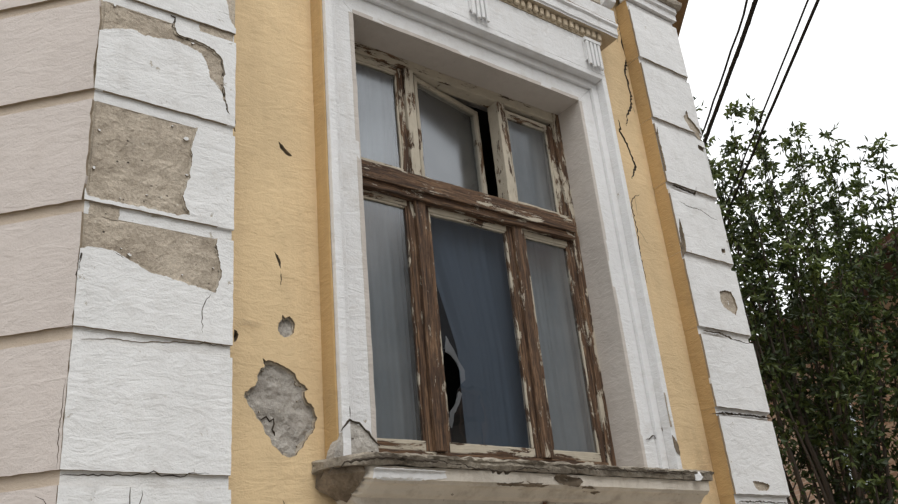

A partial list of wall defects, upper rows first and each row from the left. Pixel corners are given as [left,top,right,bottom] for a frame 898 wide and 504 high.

spalling [103,1,227,110]
spalling [199,0,235,42]
crack [615,16,648,279]
spalling [84,101,221,293]
spalling [278,317,293,337]
spalling [720,291,736,314]
crack [57,379,191,504]
spalling [244,361,316,457]
spalling [315,406,380,503]